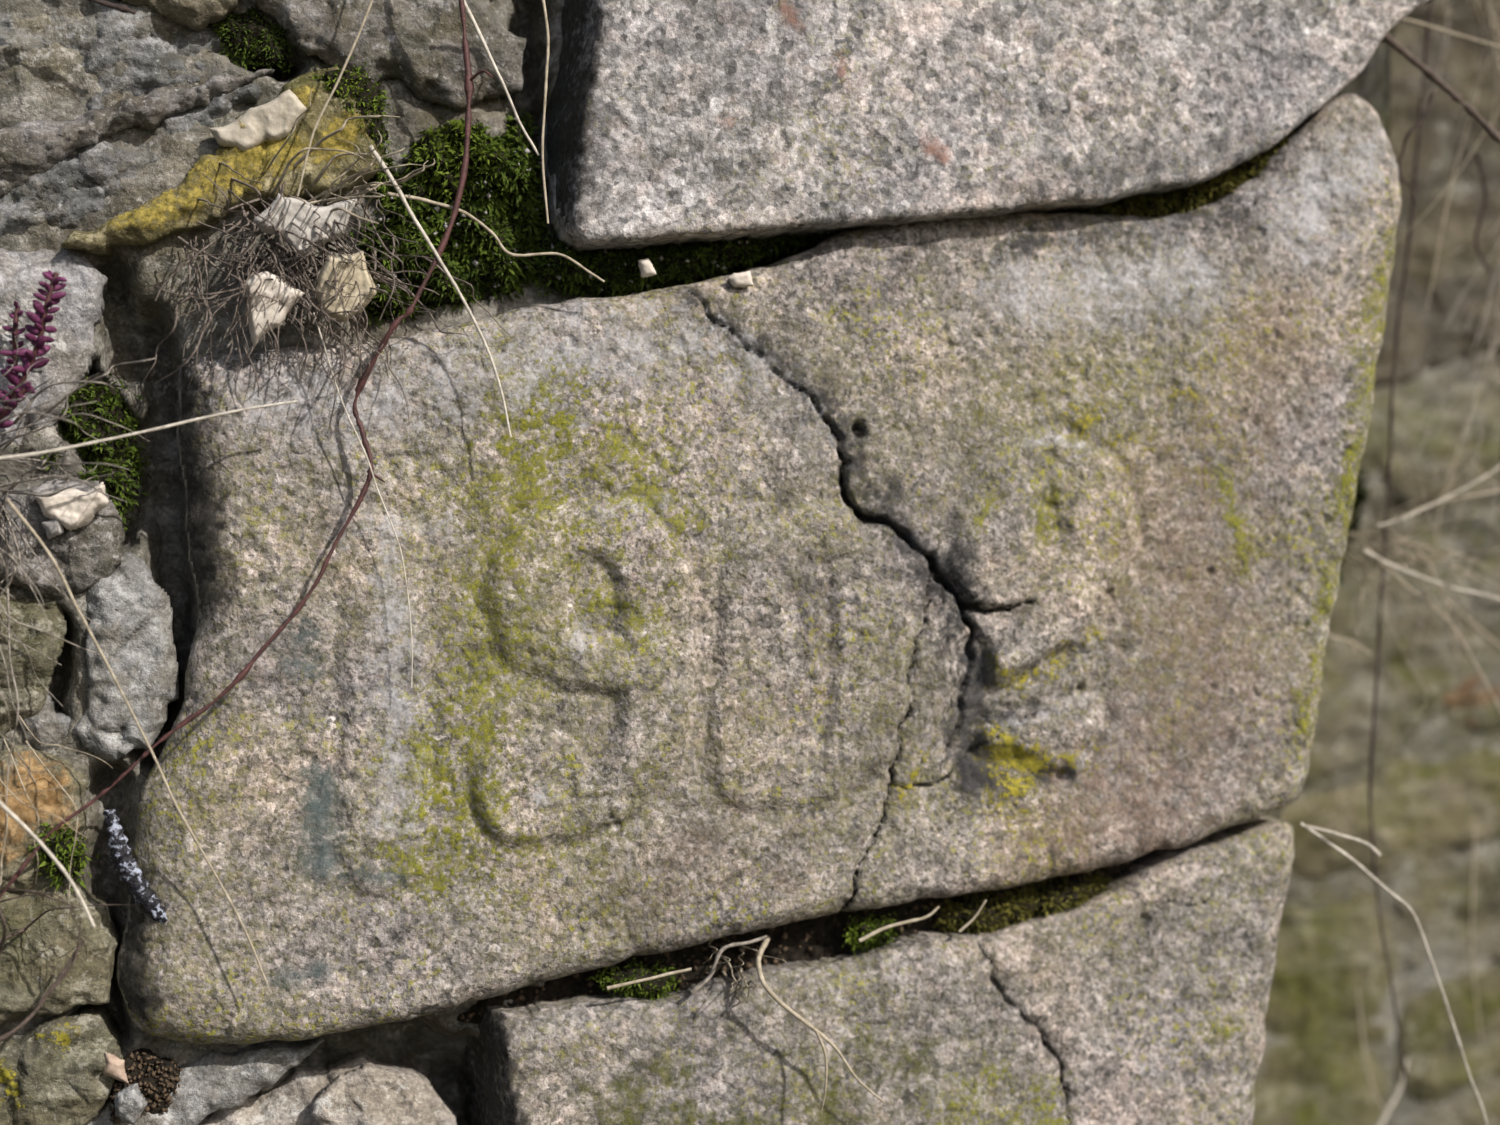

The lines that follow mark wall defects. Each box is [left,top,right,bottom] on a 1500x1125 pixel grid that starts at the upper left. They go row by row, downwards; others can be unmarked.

crack [704,310,1047,911]
crack [978,944,1092,1125]